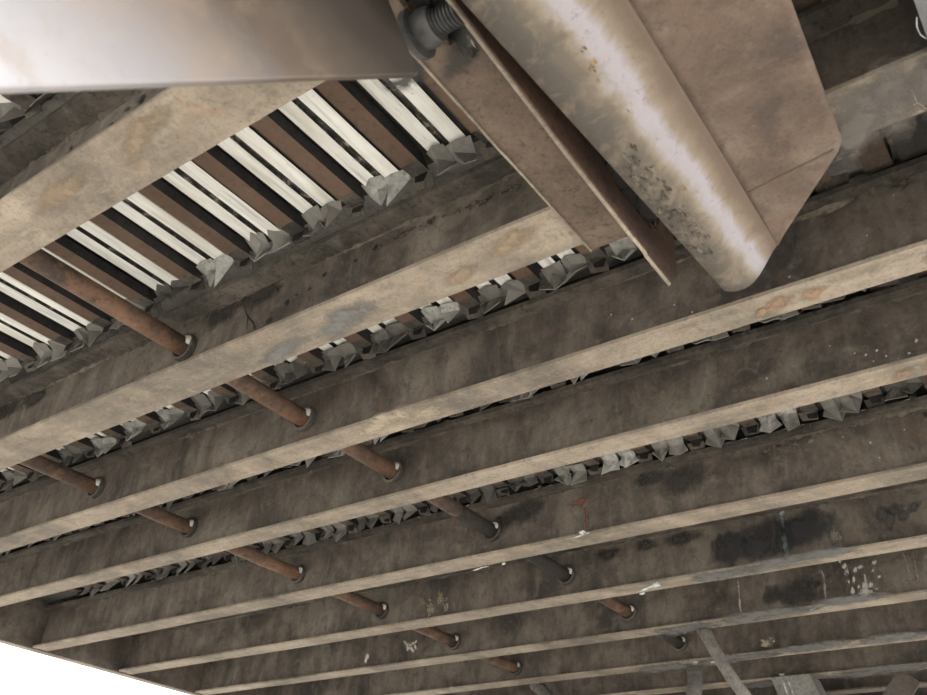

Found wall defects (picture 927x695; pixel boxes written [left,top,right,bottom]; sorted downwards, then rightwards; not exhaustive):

leakage [694,508,884,624]
leakage [654,622,711,635]